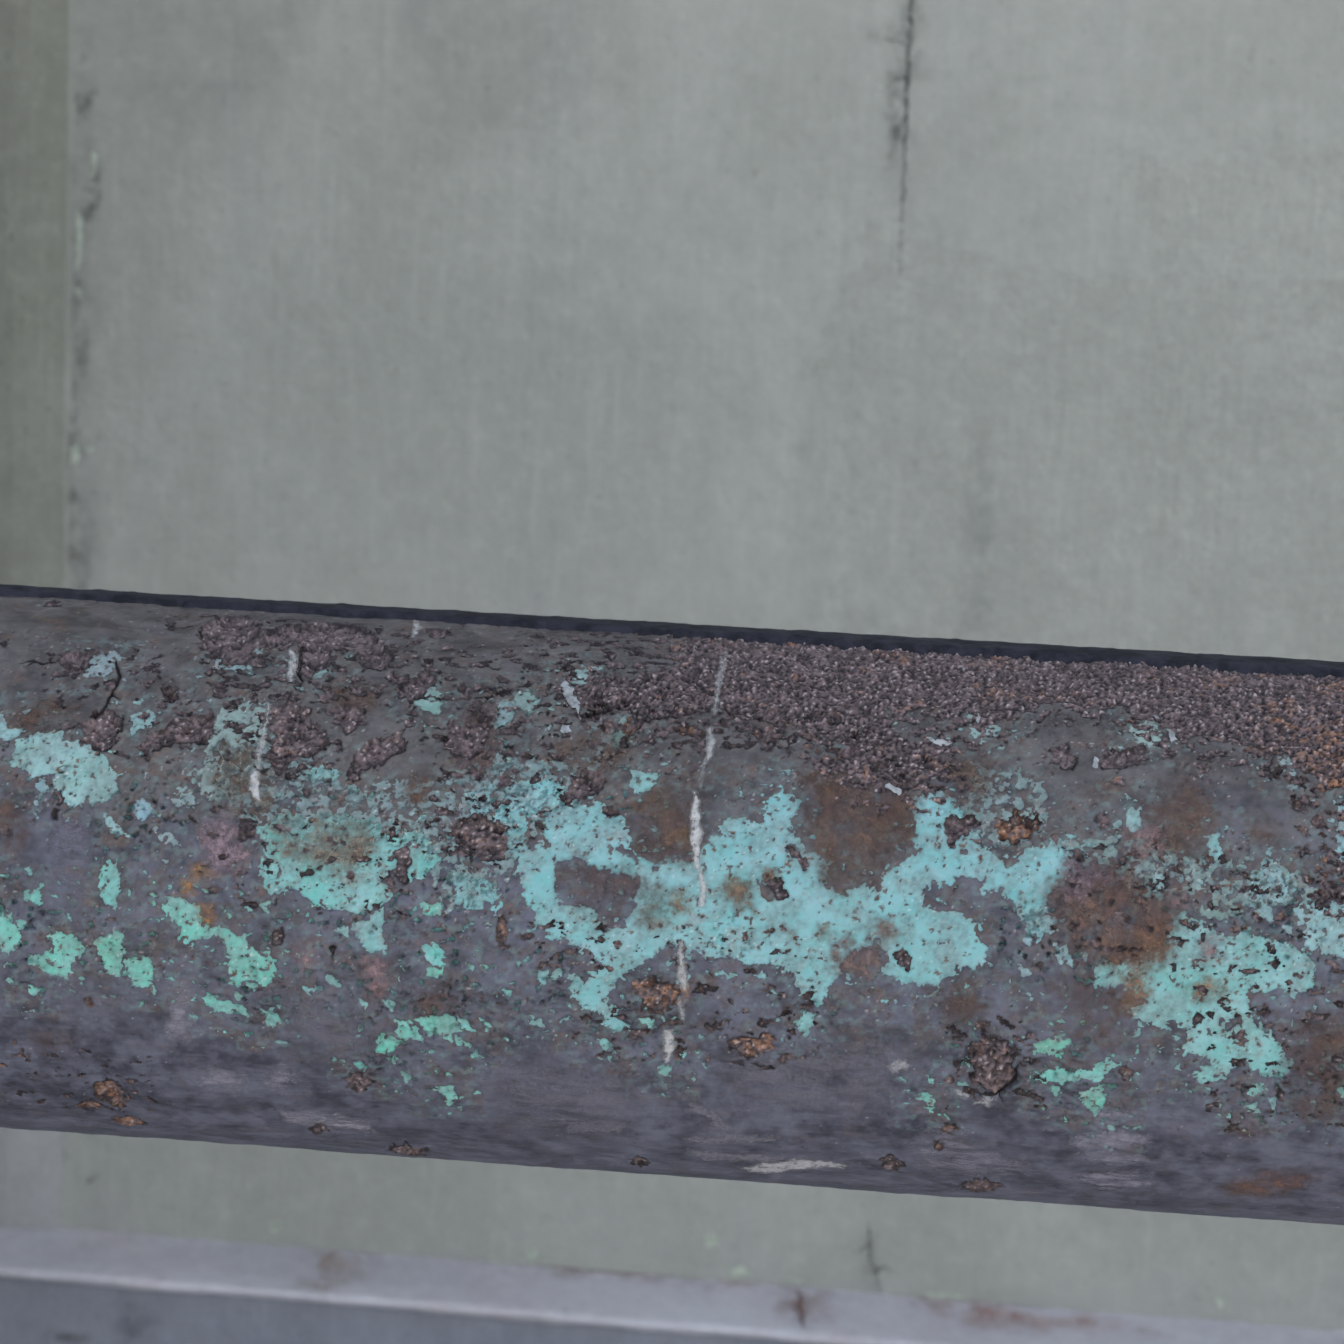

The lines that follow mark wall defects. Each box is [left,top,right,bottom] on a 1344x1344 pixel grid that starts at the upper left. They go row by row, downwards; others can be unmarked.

crack [884,0,915,275]
rust [20,648,210,764]
rust [185,614,963,923]
rust [1240,744,1344,910]
rust [516,884,896,1071]
rust [944,1015,1047,1110]
rust [1049,828,1344,1132]